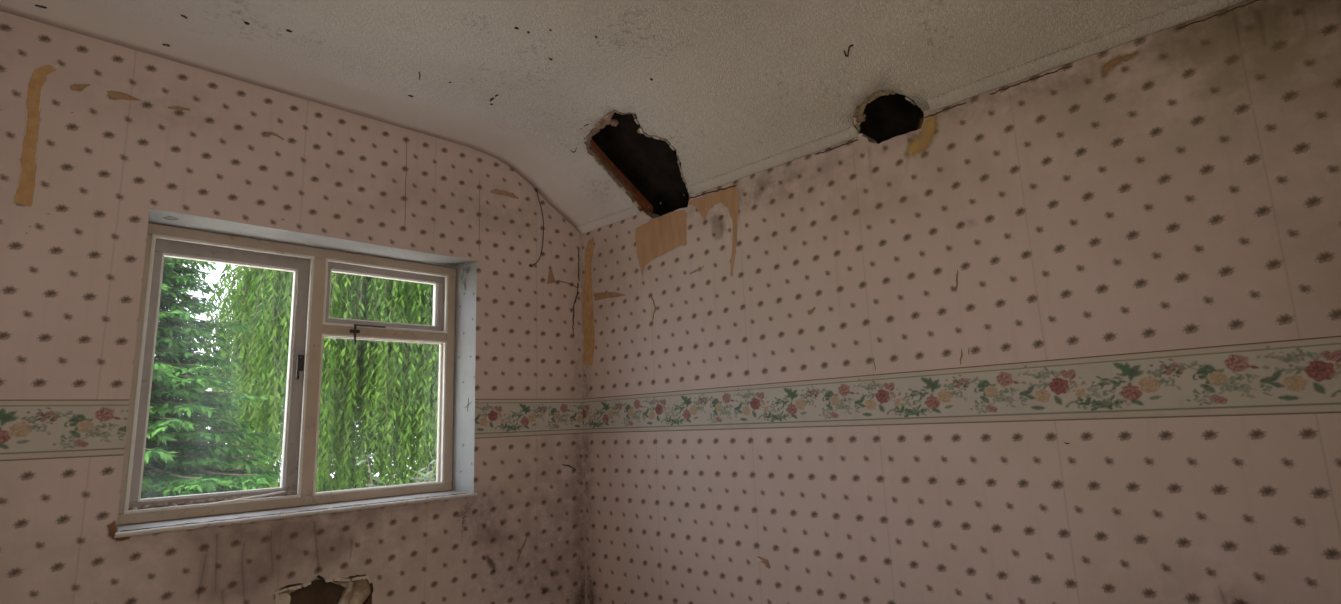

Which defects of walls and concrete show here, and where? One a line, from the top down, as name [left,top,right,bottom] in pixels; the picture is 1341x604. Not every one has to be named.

spalling [853,90,916,130]
spalling [584,109,688,209]
spalling [275,575,374,604]